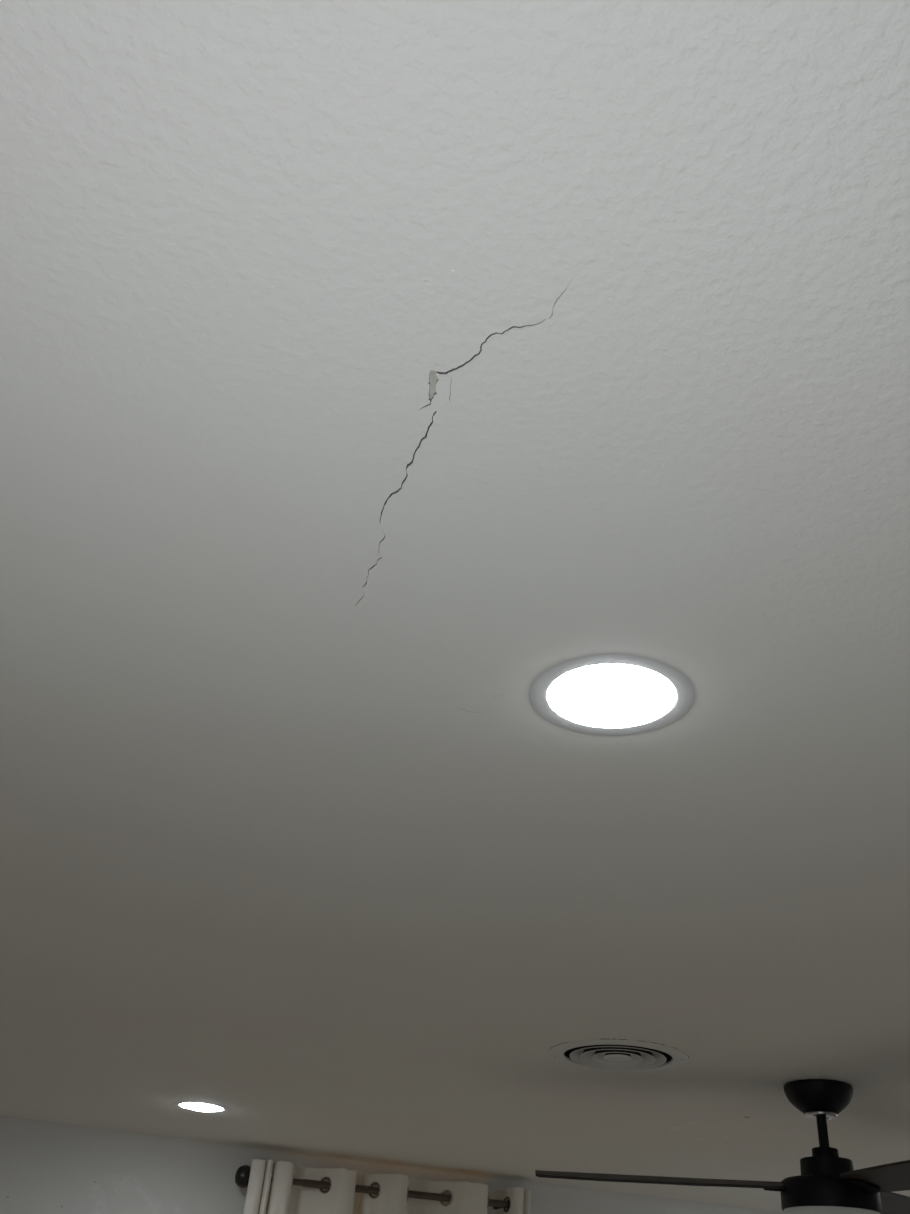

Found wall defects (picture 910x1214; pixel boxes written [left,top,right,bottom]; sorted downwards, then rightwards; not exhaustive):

crack [355,276,575,606]